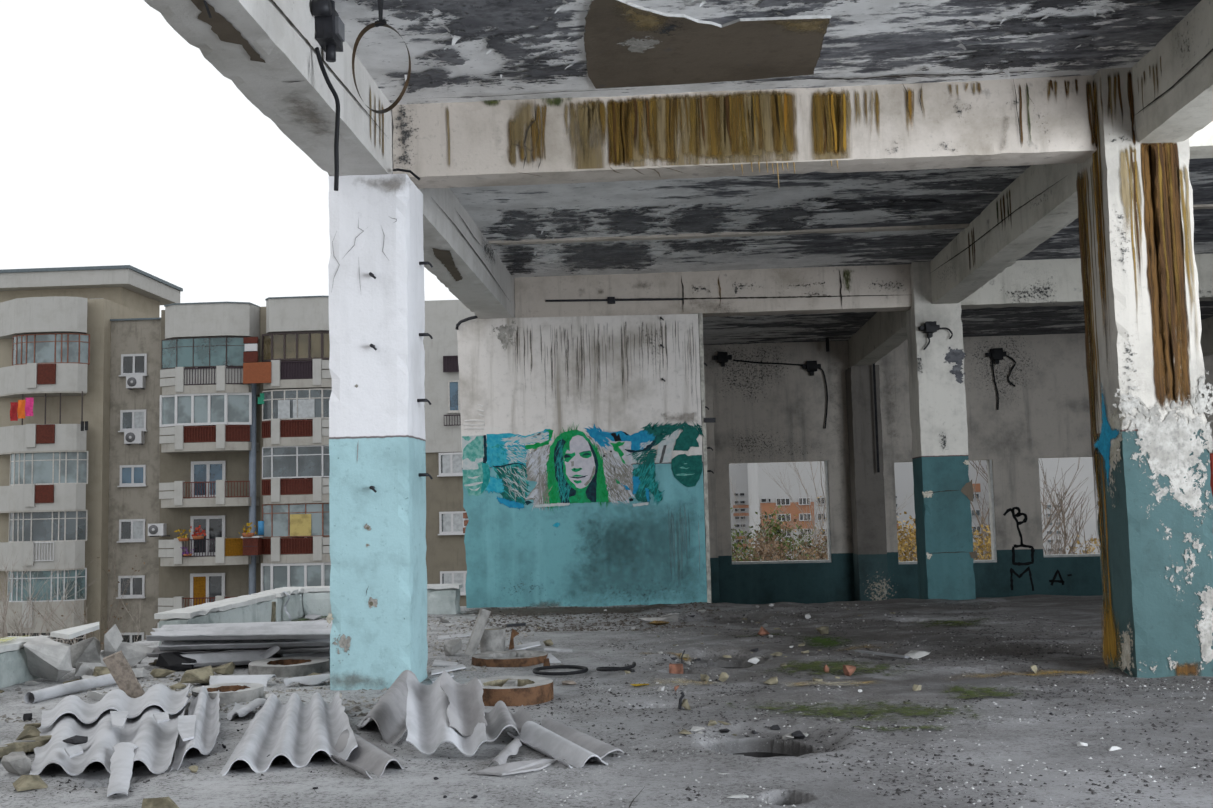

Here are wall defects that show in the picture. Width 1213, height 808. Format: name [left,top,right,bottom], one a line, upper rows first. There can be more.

spalling [191,0,266,63]
spalling [355,0,858,93]
corrosion [508,102,547,176]
corrosion [565,92,796,176]
corrosion [812,89,879,160]
corrosion [1019,85,1031,144]
peeling [481,194,946,275]
spalling [943,346,966,384]
corrosion [1048,56,1197,665]
peeling [1106,370,1213,676]